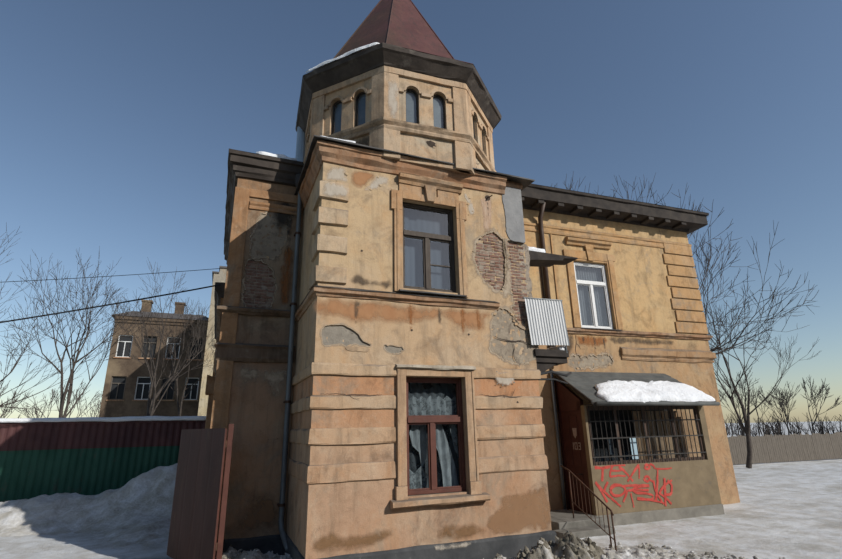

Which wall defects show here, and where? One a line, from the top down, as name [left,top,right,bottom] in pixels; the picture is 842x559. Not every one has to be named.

flaking render [249,211,293,260]
flaking render [472,228,539,367]
spalling [320,323,371,352]
spalling [384,344,404,355]
flaking render [568,353,614,371]
leakage [488,488,551,533]
leakage [315,532,389,550]
leakage [436,526,478,549]